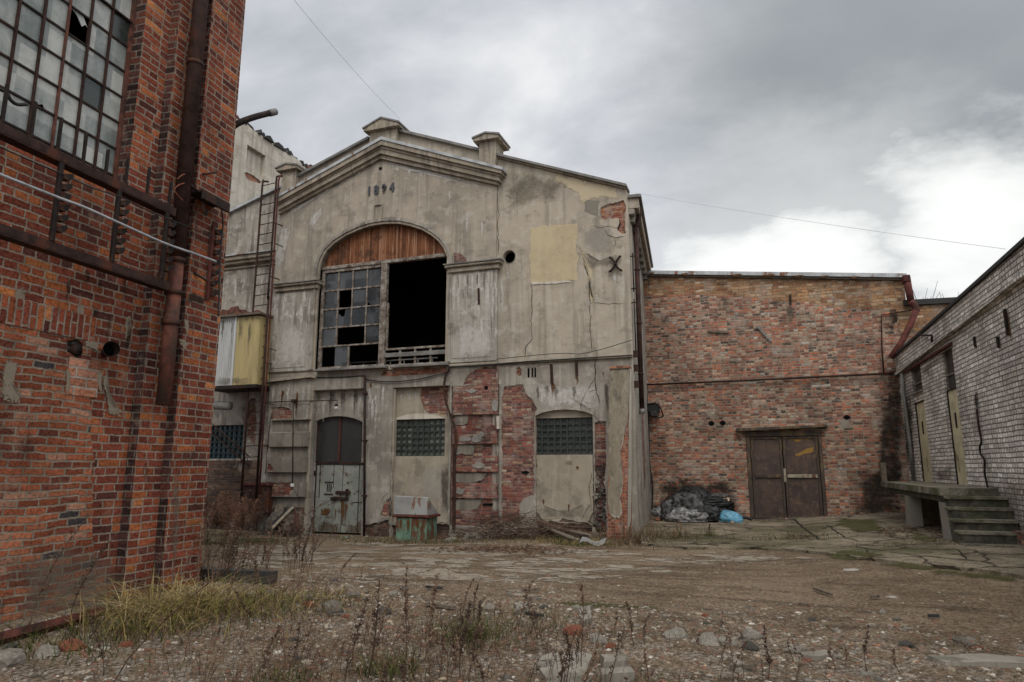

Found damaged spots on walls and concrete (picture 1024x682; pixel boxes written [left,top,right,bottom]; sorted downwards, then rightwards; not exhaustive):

spalling [600,201,626,234]
rust [318,467,361,532]
spalling [380,365,537,537]
spalling [539,409,646,540]